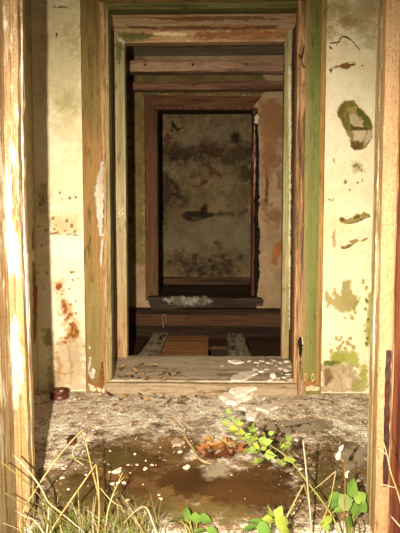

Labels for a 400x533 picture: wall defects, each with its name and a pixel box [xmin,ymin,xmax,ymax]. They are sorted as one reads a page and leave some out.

crack [329,36,360,50]
spalling [337,100,373,150]
leakage [159,133,251,224]
peeling [94,161,104,266]
spalling [339,212,370,224]
corrosion [55,281,79,344]
spalling [320,364,363,392]